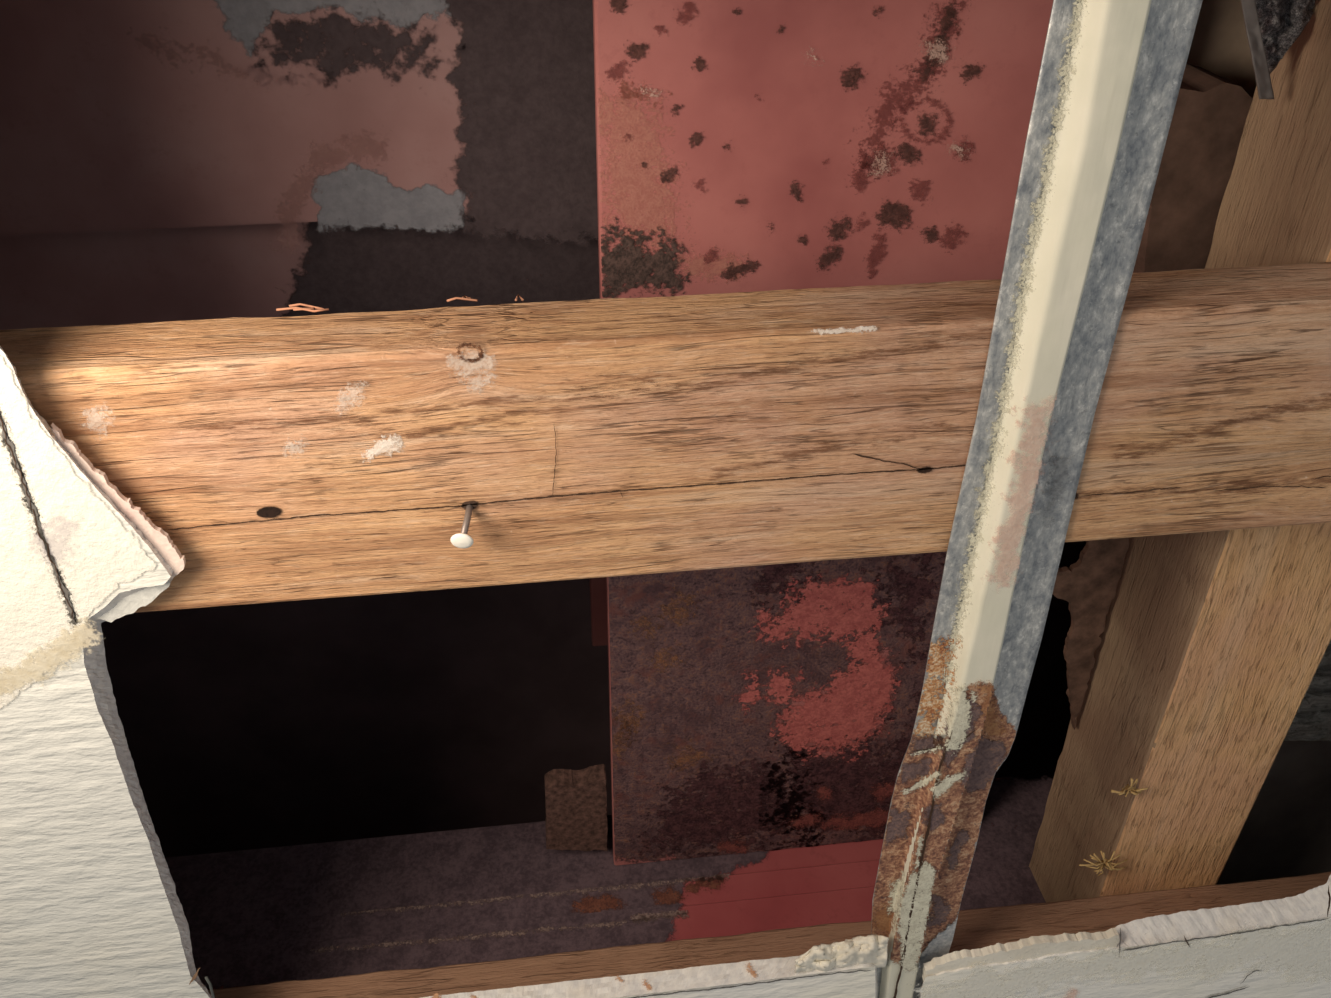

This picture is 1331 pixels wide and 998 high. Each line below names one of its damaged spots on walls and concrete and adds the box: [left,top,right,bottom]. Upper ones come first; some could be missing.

peeling [214,0,749,317]
rust [605,0,699,83]
rust [642,162,680,183]
rust [689,132,704,148]
rust [704,249,761,281]
rust [817,0,985,279]
peeling [910,0,1087,756]
crack [0,411,80,627]
peeling [732,570,903,766]
rust [165,551,1053,990]
peeling [790,768,968,832]
peeling [885,837,958,972]